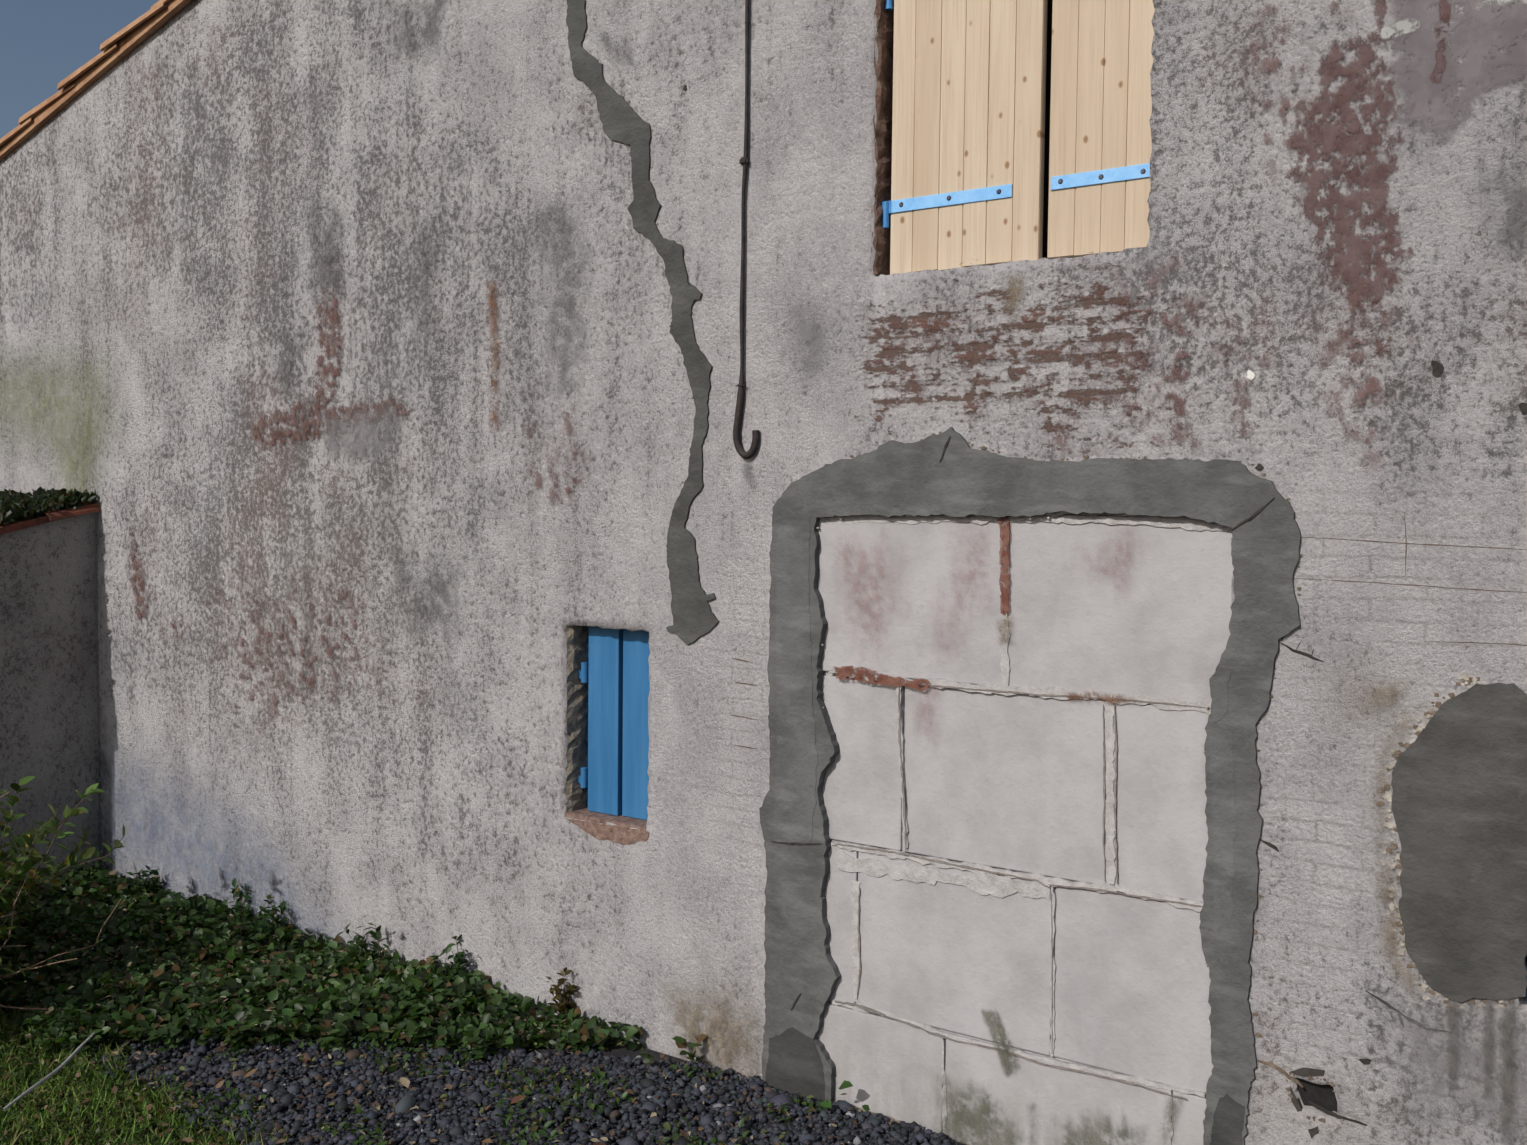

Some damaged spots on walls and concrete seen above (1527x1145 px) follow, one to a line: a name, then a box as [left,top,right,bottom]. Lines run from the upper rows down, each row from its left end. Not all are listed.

peeling [1253,0,1527,441]
crack [566,0,757,749]
peeling [850,252,1198,461]
peeling [1232,321,1265,423]
spalling [1257,1060,1344,1139]